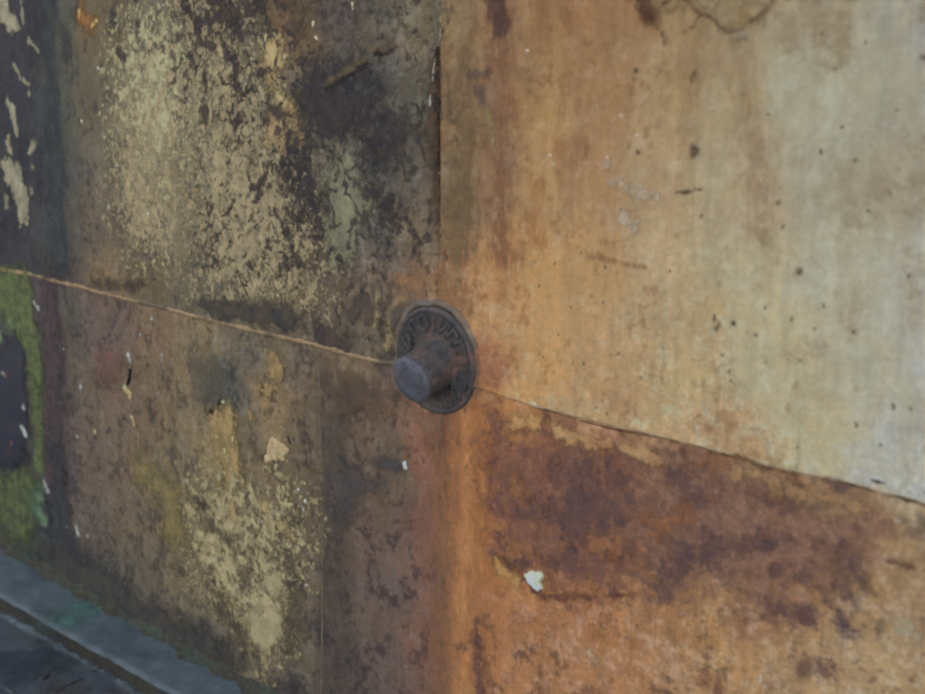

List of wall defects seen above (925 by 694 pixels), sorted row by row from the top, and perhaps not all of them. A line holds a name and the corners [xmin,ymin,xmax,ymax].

peeling [0,0,40,54]
peeling [12,62,31,97]
peeling [0,94,38,228]
damp [161,0,452,356]
corrosion [435,394,495,694]